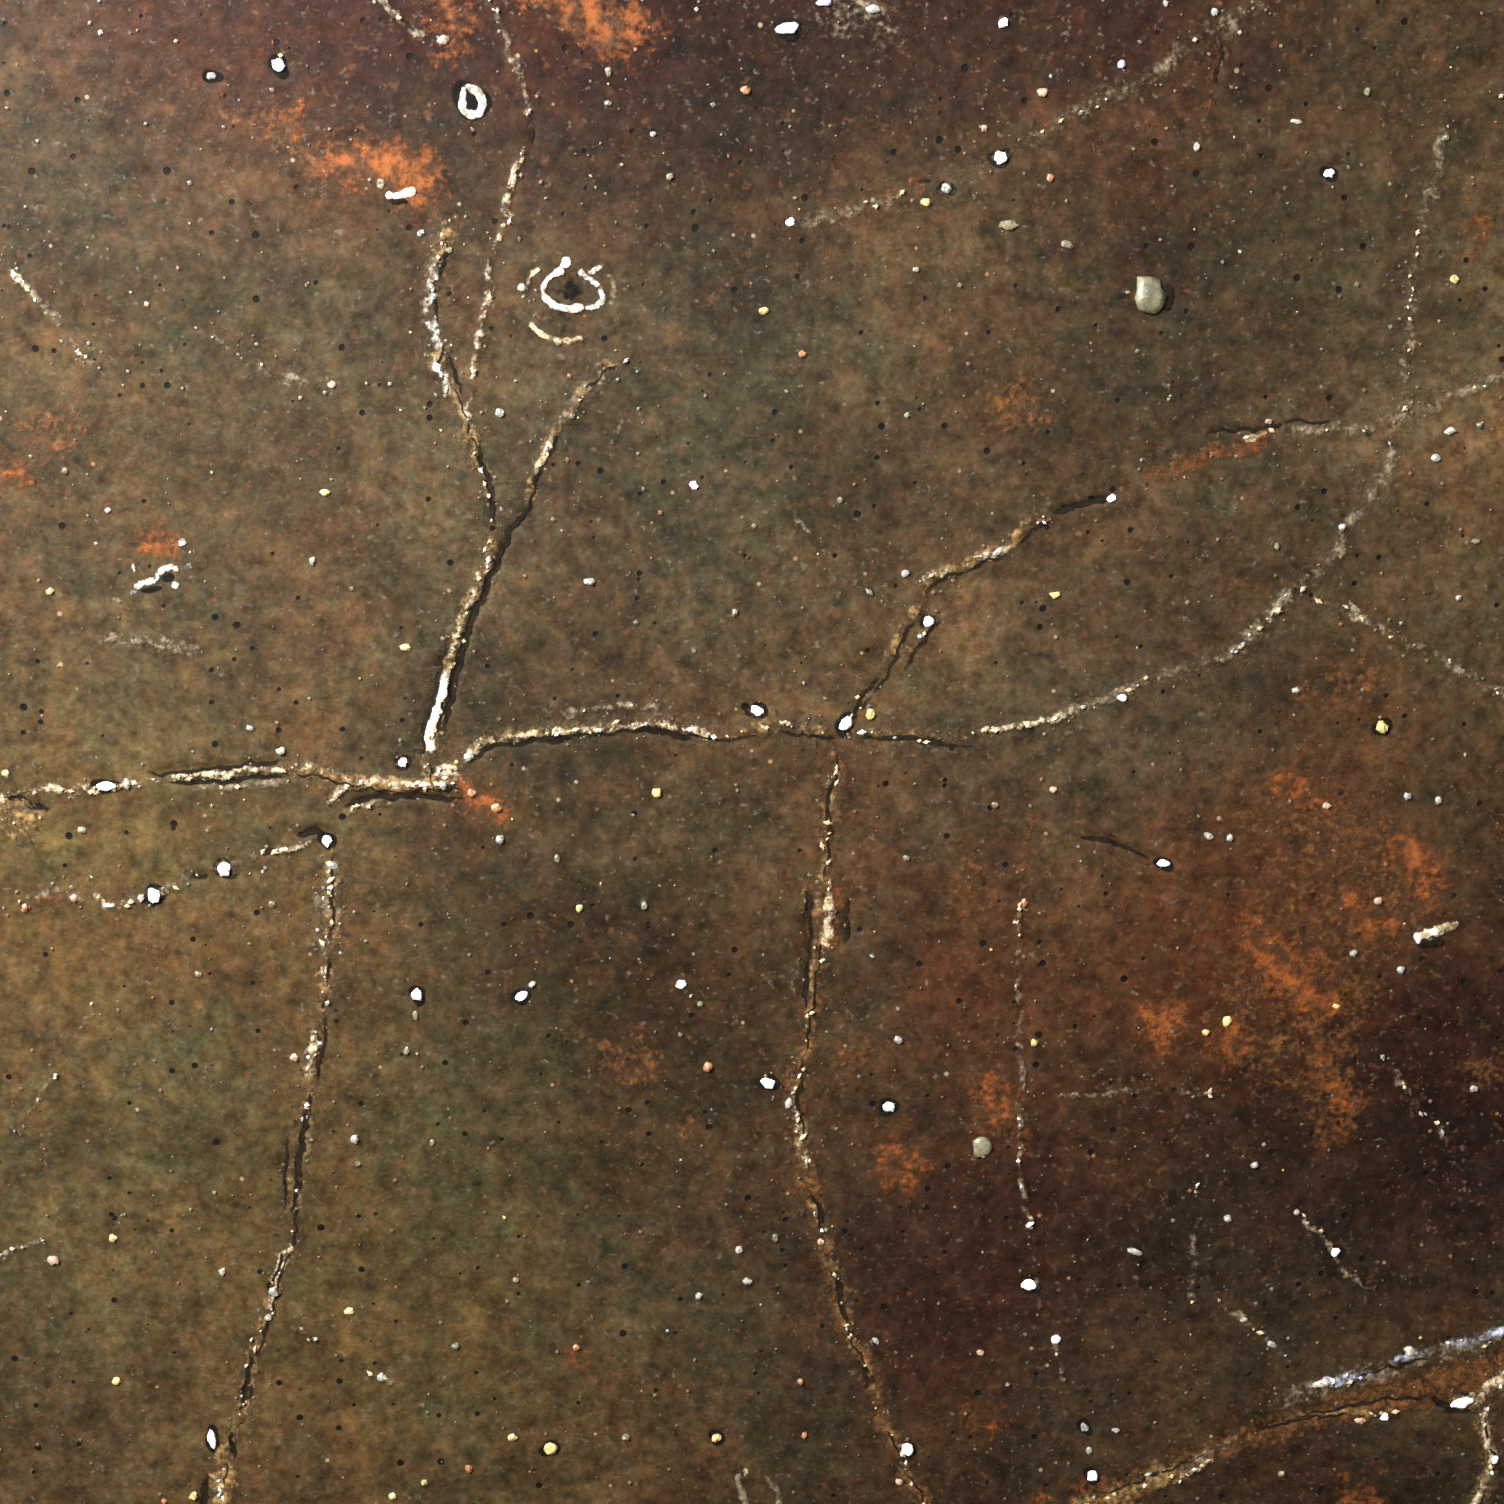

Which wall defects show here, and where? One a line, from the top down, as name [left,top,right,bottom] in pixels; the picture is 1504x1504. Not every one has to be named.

corrosion [422,0,475,67]
crack [488,0,534,241]
corrosion [518,0,659,60]
crack [1030,2,1265,144]
crack [798,169,977,230]
crack [0,216,933,1504]
crack [1013,814,1148,1229]
corrosion [1137,762,1452,1154]
crack [1381,1055,1444,1136]
crack [1302,1214,1361,1285]
crack [1055,1294,1504,1504]